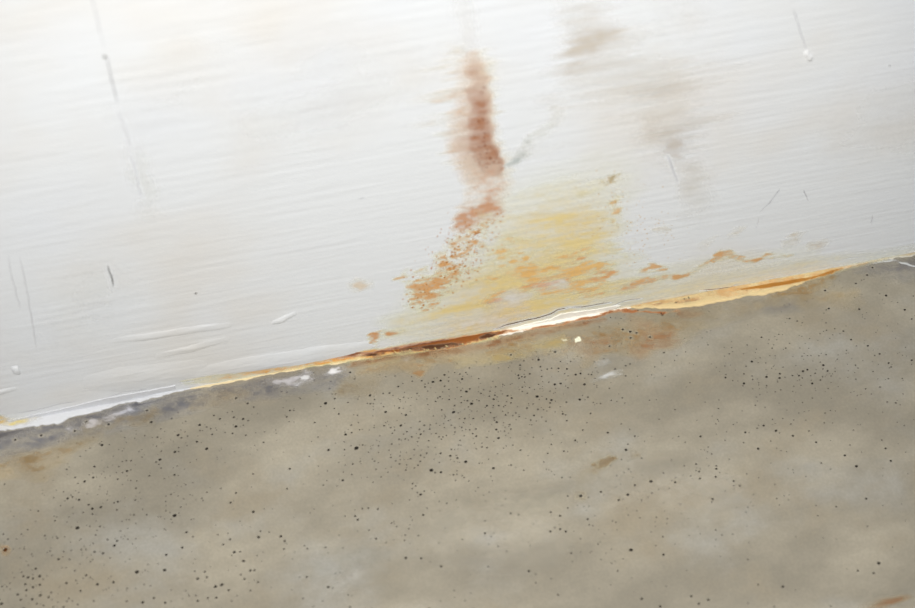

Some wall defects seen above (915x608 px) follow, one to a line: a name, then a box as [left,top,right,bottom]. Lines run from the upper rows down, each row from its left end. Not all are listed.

rust [393,51,506,311]
rust [206,256,850,382]
crack [499,298,641,328]